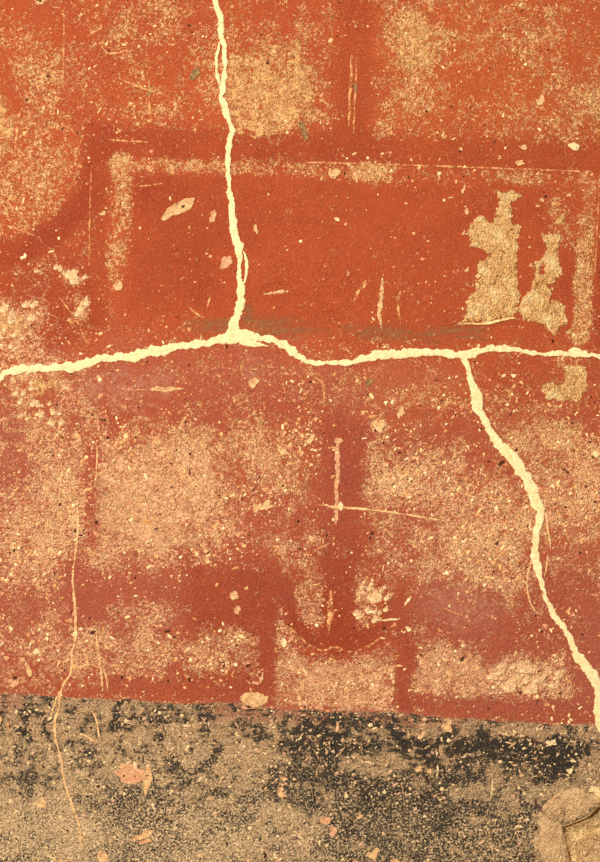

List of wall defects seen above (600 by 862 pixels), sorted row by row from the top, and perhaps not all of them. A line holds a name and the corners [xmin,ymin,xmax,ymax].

crack [0,0,600,382]
peeling [457,189,574,336]
crack [50,507,108,845]
crack [324,504,444,521]
crack [461,353,600,733]
flaking render [561,786,600,862]